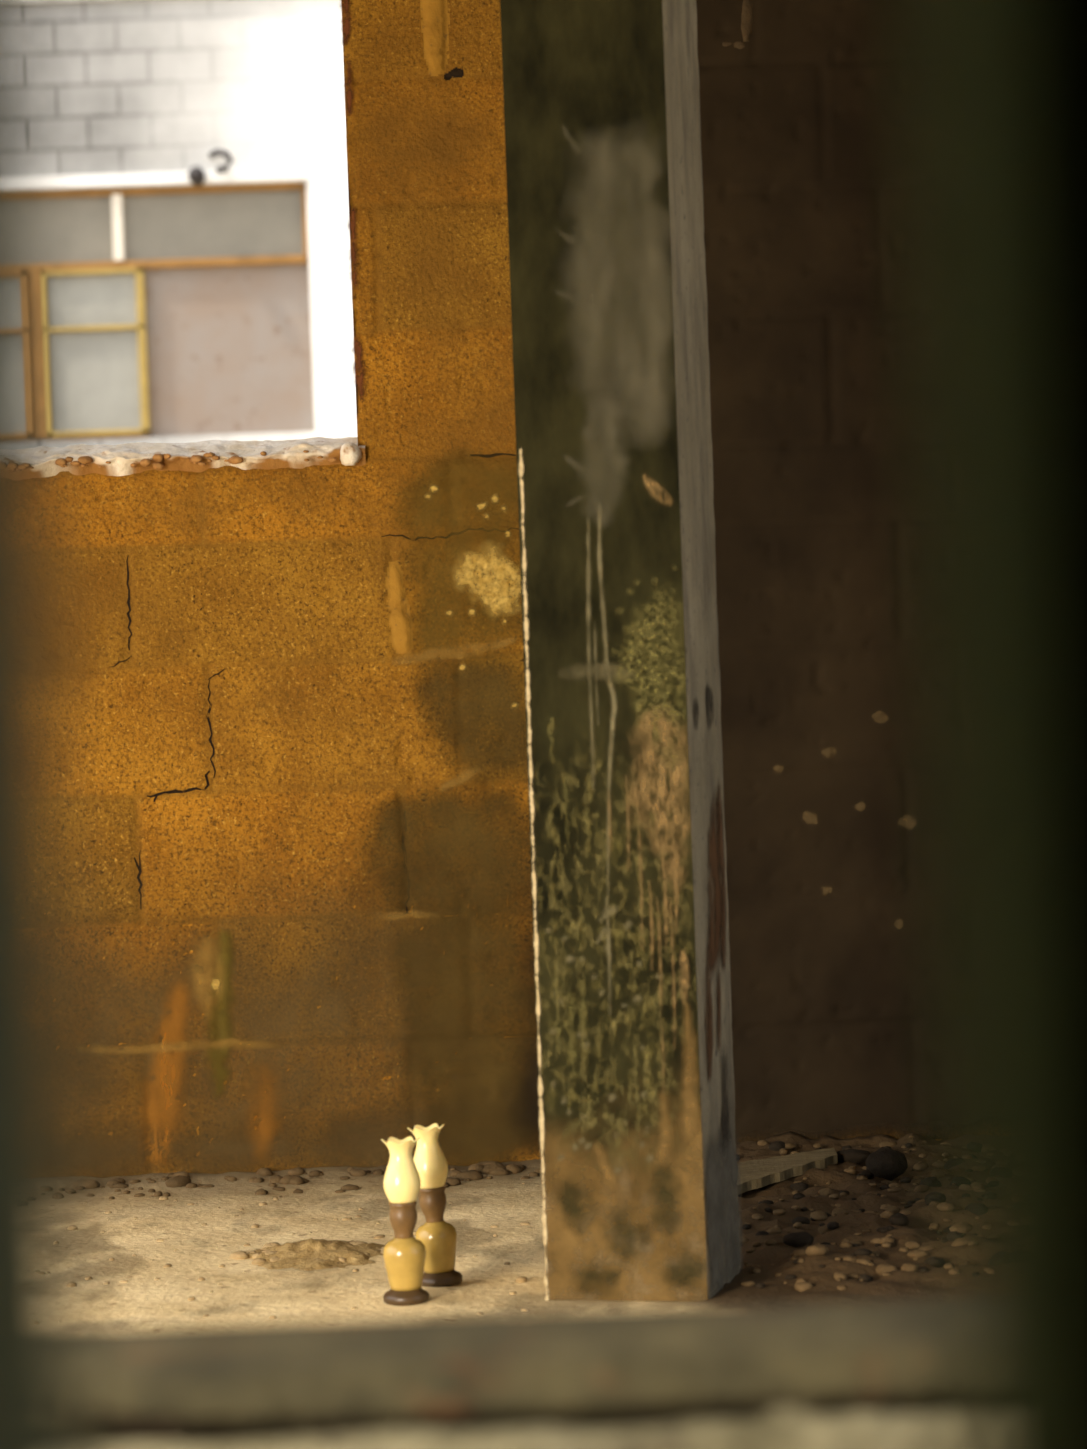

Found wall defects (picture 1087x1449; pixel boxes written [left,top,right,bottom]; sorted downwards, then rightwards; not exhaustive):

water stain [455,0,743,1292]
rust [148,989,184,1160]
water stain [56,909,465,1168]